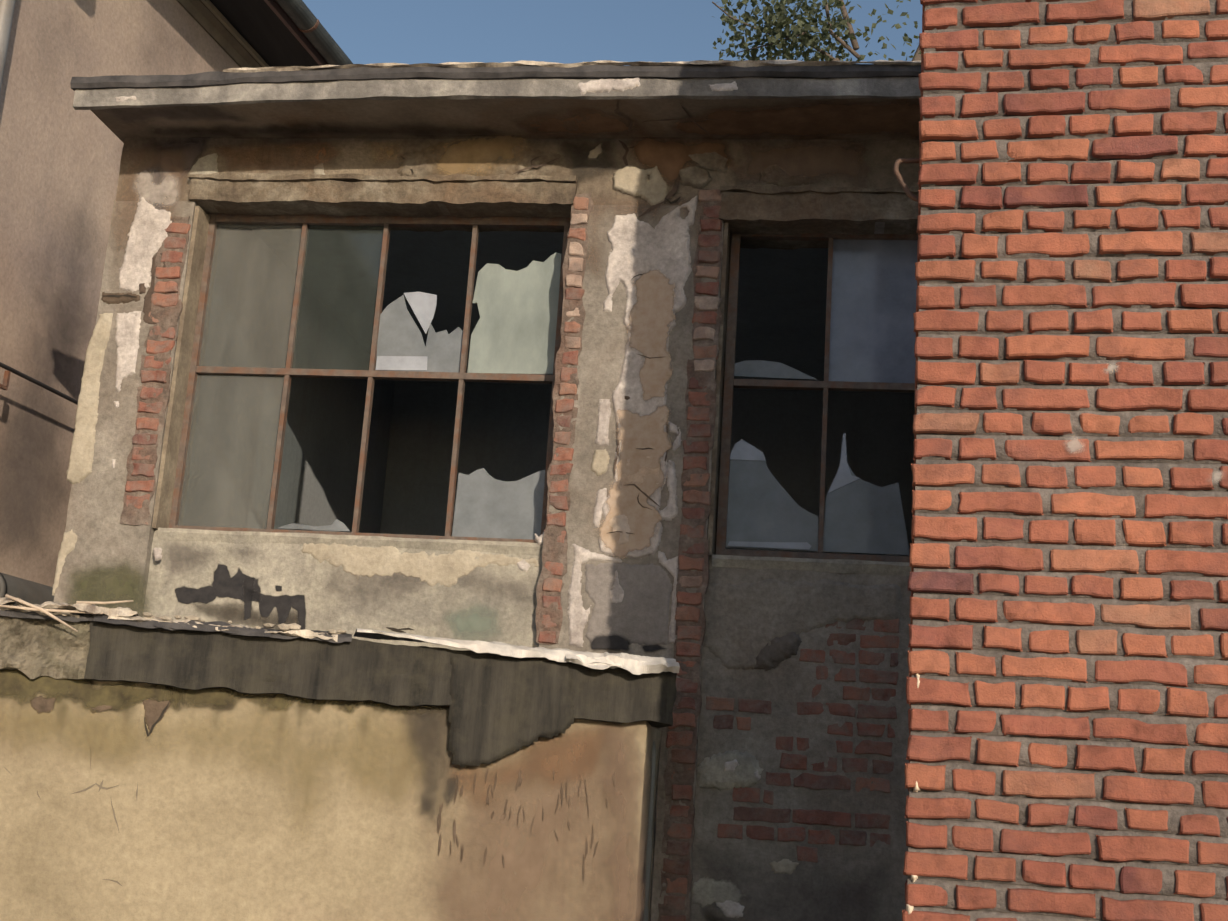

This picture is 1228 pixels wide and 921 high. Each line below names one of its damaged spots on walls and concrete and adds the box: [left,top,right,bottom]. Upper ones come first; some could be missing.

peeling [588,143,602,158]
spalling [66,153,218,526]
peeling [52,529,77,596]
peeling [301,152,772,921]
damp [0,669,456,811]
spalling [717,619,900,874]